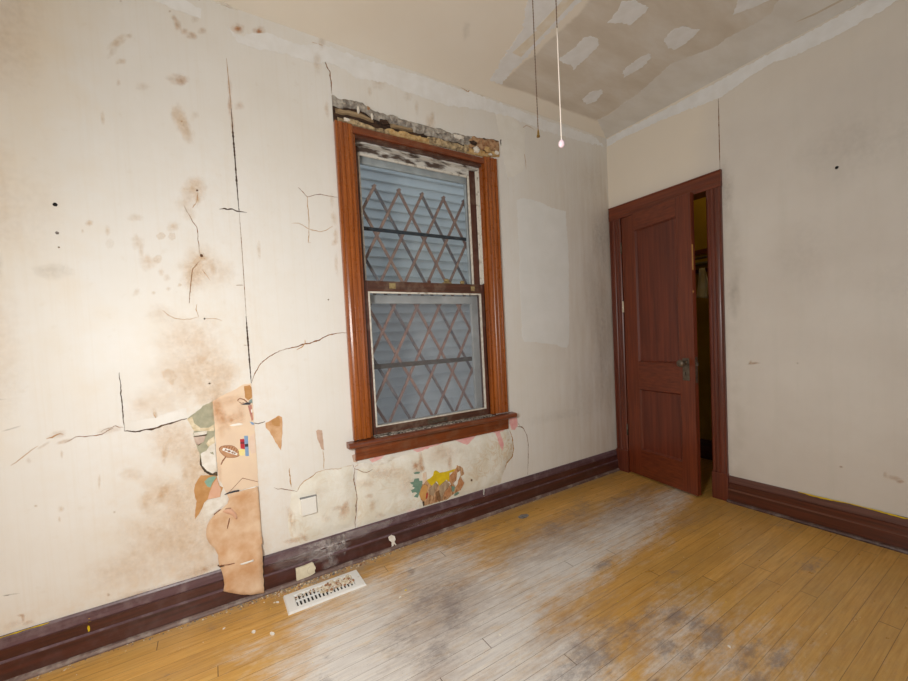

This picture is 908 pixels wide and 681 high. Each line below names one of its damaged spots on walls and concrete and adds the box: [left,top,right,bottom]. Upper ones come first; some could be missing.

crack [165,193,219,320]
crack [222,58,344,383]
crack [12,376,187,465]
flaking render [187,401,217,487]
flaking render [204,495,228,523]
peeling [241,385,252,405]
flaking render [356,456,395,470]
peeling [410,465,464,506]